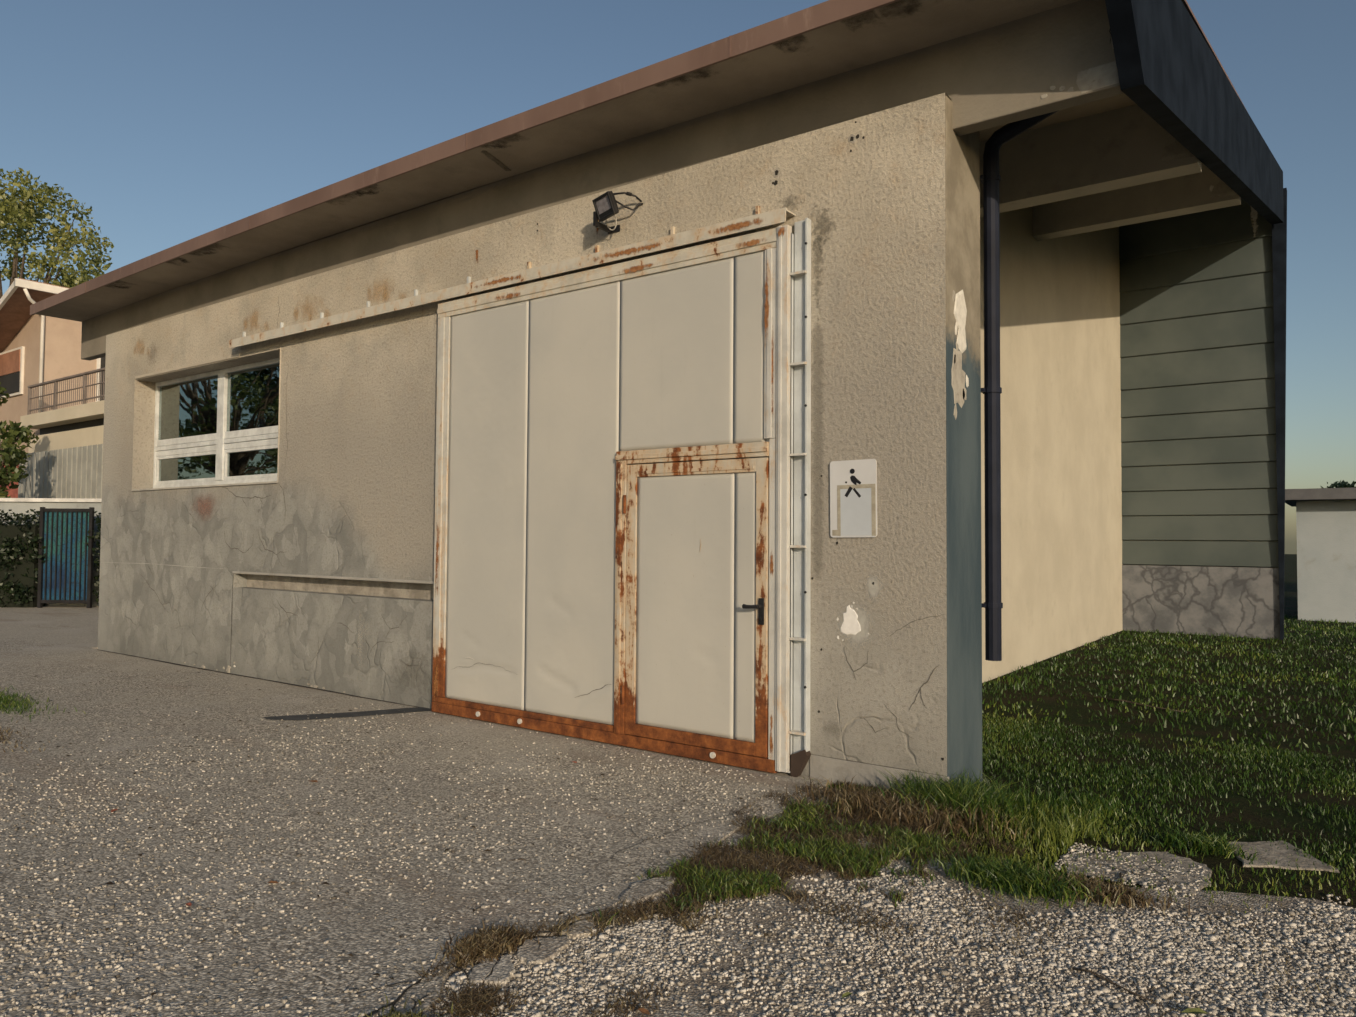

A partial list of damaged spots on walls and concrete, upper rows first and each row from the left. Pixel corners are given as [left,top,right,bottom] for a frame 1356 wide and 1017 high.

rust [716,218,761,246]
rust [595,244,660,273]
rust [476,275,521,299]
rust [764,278,773,383]
peeling [837,602,869,641]
crack [844,615,941,679]
crack [812,665,942,776]